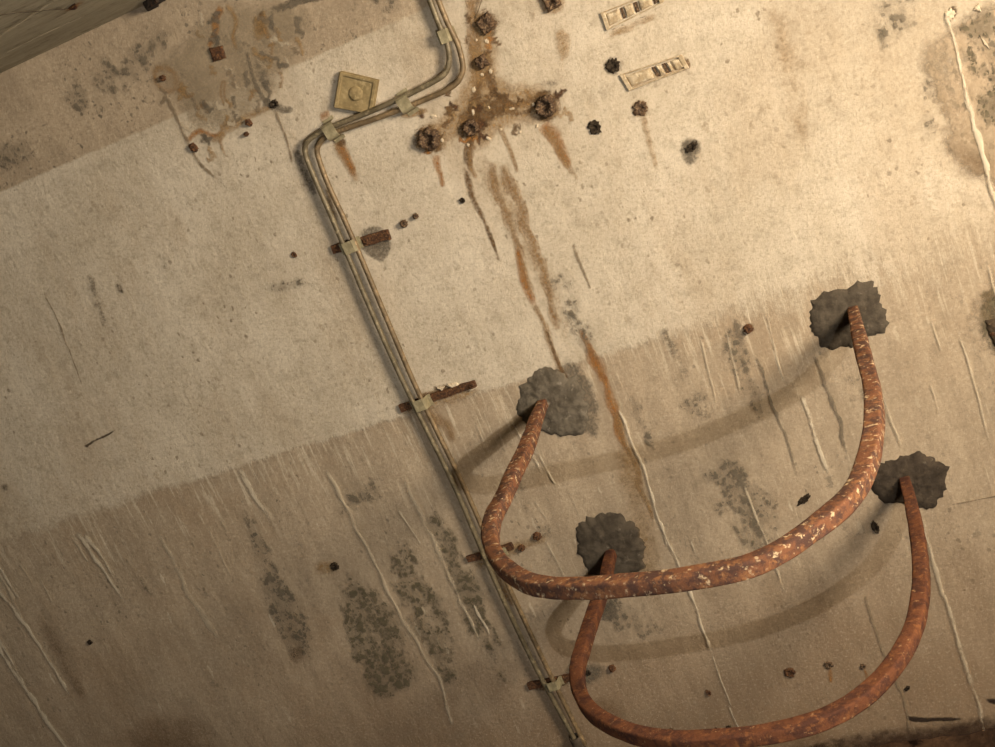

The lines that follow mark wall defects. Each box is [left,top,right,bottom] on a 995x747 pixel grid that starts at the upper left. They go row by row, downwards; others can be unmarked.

water stain [96,0,313,176]
water stain [879,0,914,48]
corrosion [403,0,573,378]
corrosion [581,332,653,548]
water stain [247,515,312,658]
water stain [344,511,456,697]
water stain [429,511,501,655]